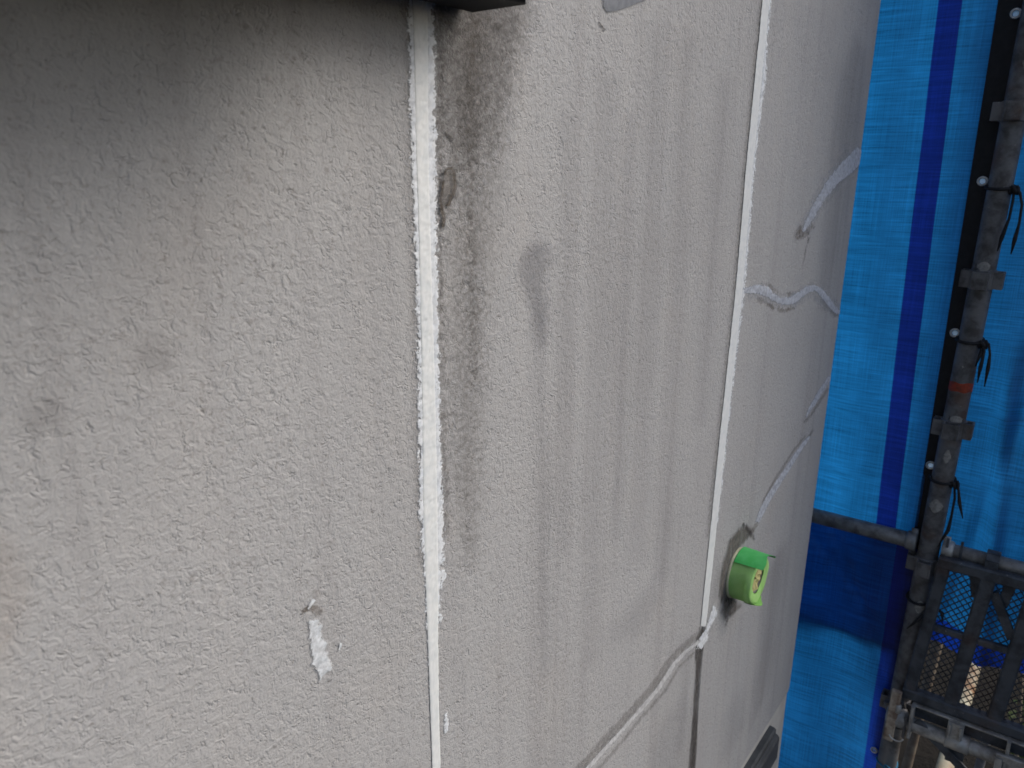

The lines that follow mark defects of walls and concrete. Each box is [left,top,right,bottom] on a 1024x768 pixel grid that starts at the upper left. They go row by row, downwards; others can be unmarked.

crack [802,147,862,232]
crack [744,285,840,314]
crack [755,376,831,523]
crack [586,606,718,768]